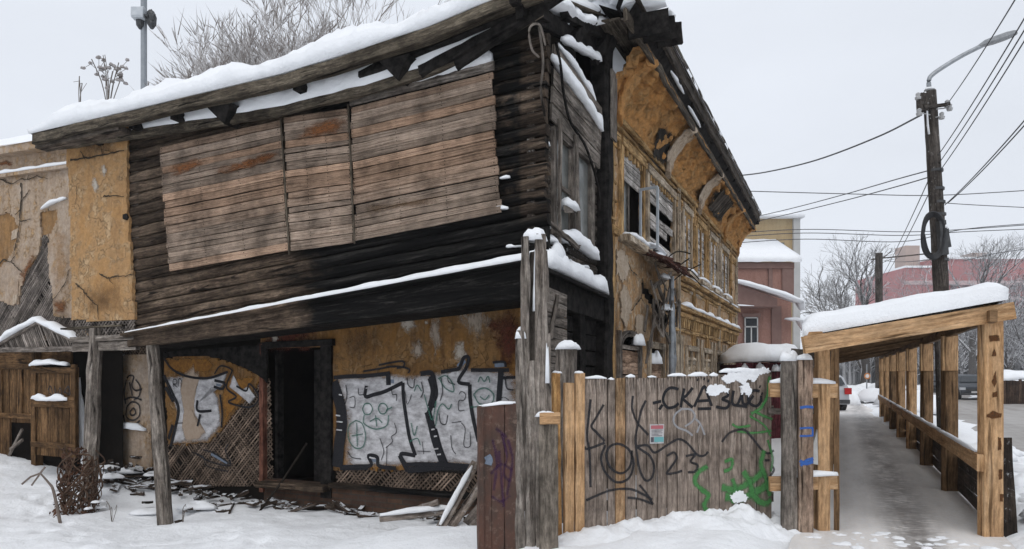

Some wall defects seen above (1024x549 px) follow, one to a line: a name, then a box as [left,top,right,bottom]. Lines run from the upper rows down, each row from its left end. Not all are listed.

crack [70,148,124,161]
flaking render [667,129,694,168]
flaking render [699,177,720,208]
flaking render [0,210,73,336]
crack [51,270,132,313]
flaking render [615,249,647,337]